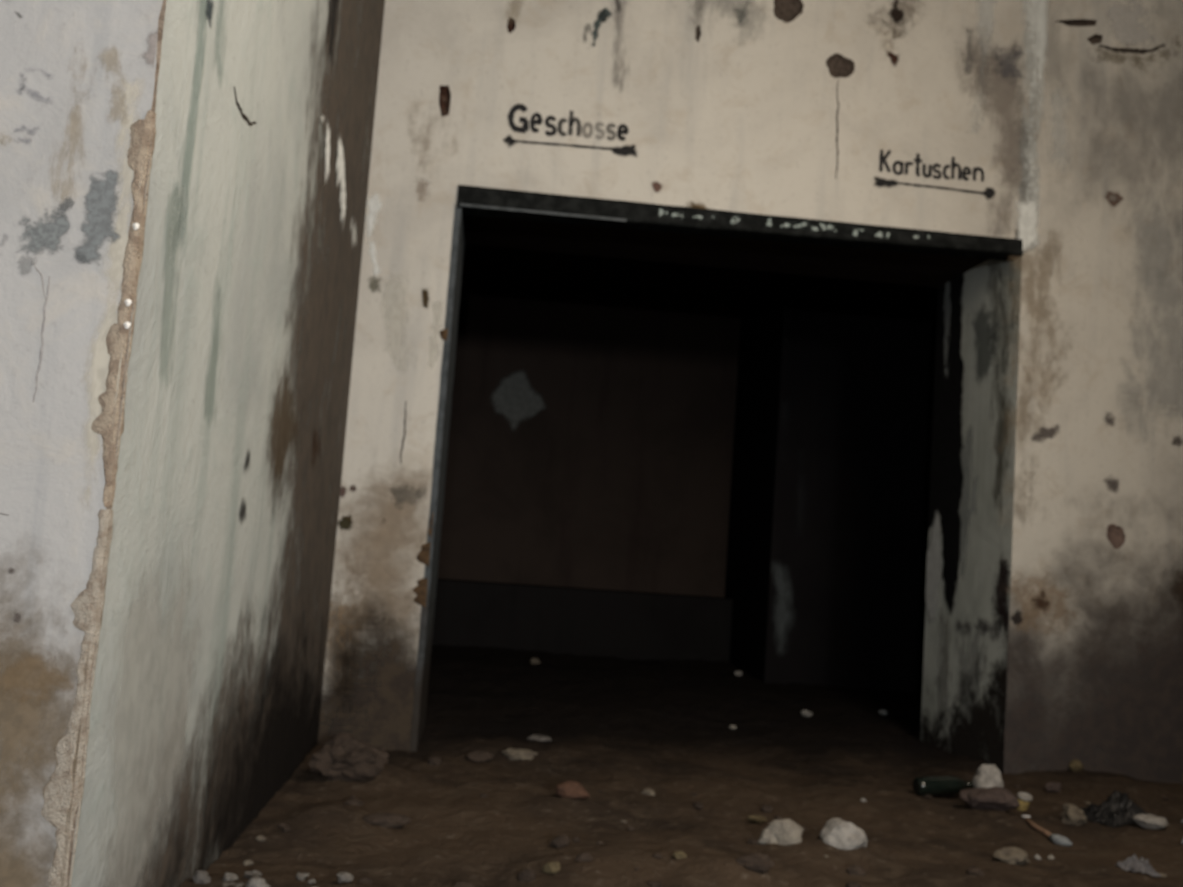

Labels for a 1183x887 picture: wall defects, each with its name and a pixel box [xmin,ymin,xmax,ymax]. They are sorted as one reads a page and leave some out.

spalling [19,110,156,887]